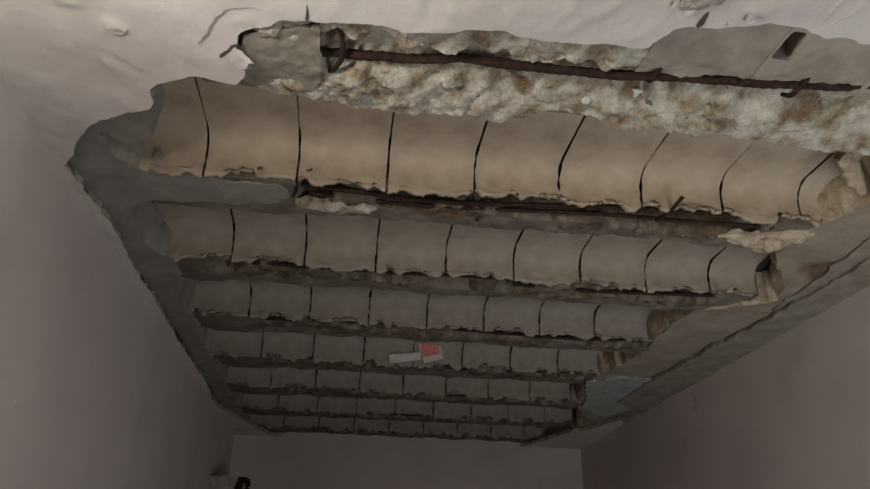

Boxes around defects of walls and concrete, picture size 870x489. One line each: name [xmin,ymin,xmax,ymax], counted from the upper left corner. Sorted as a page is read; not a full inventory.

peeling [671,0,726,17]
spalling [64,28,870,447]